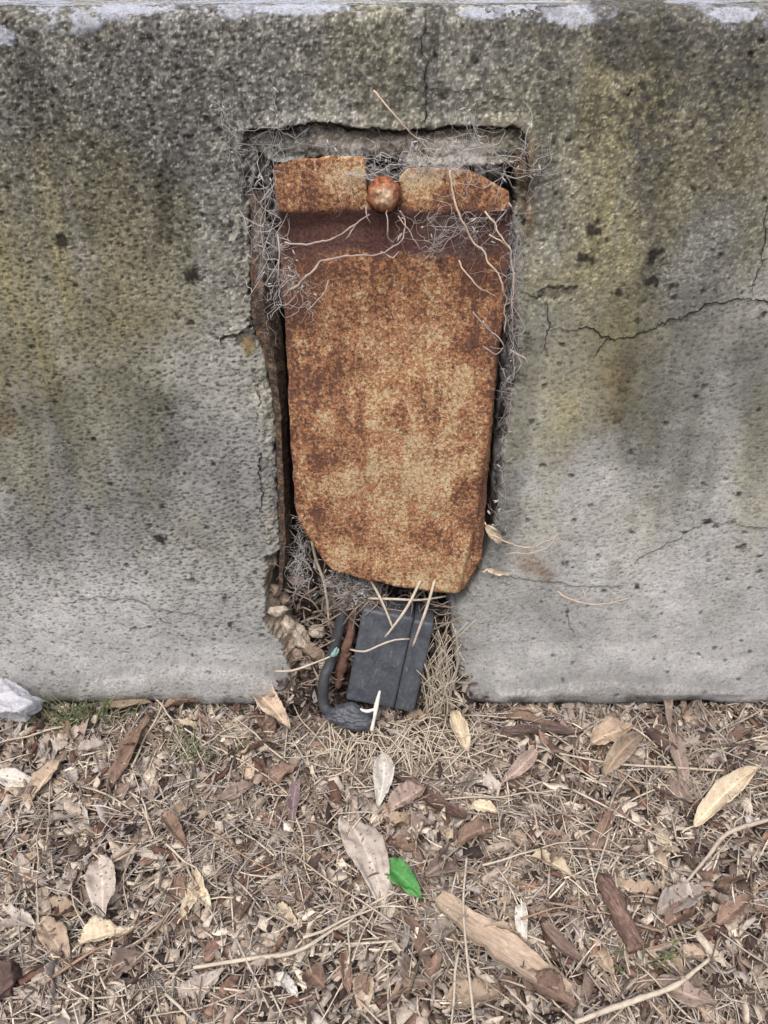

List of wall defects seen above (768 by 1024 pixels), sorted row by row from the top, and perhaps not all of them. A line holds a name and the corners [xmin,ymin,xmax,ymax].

crack [242,9,531,190]
crack [520,210,768,360]
crack [637,519,768,560]